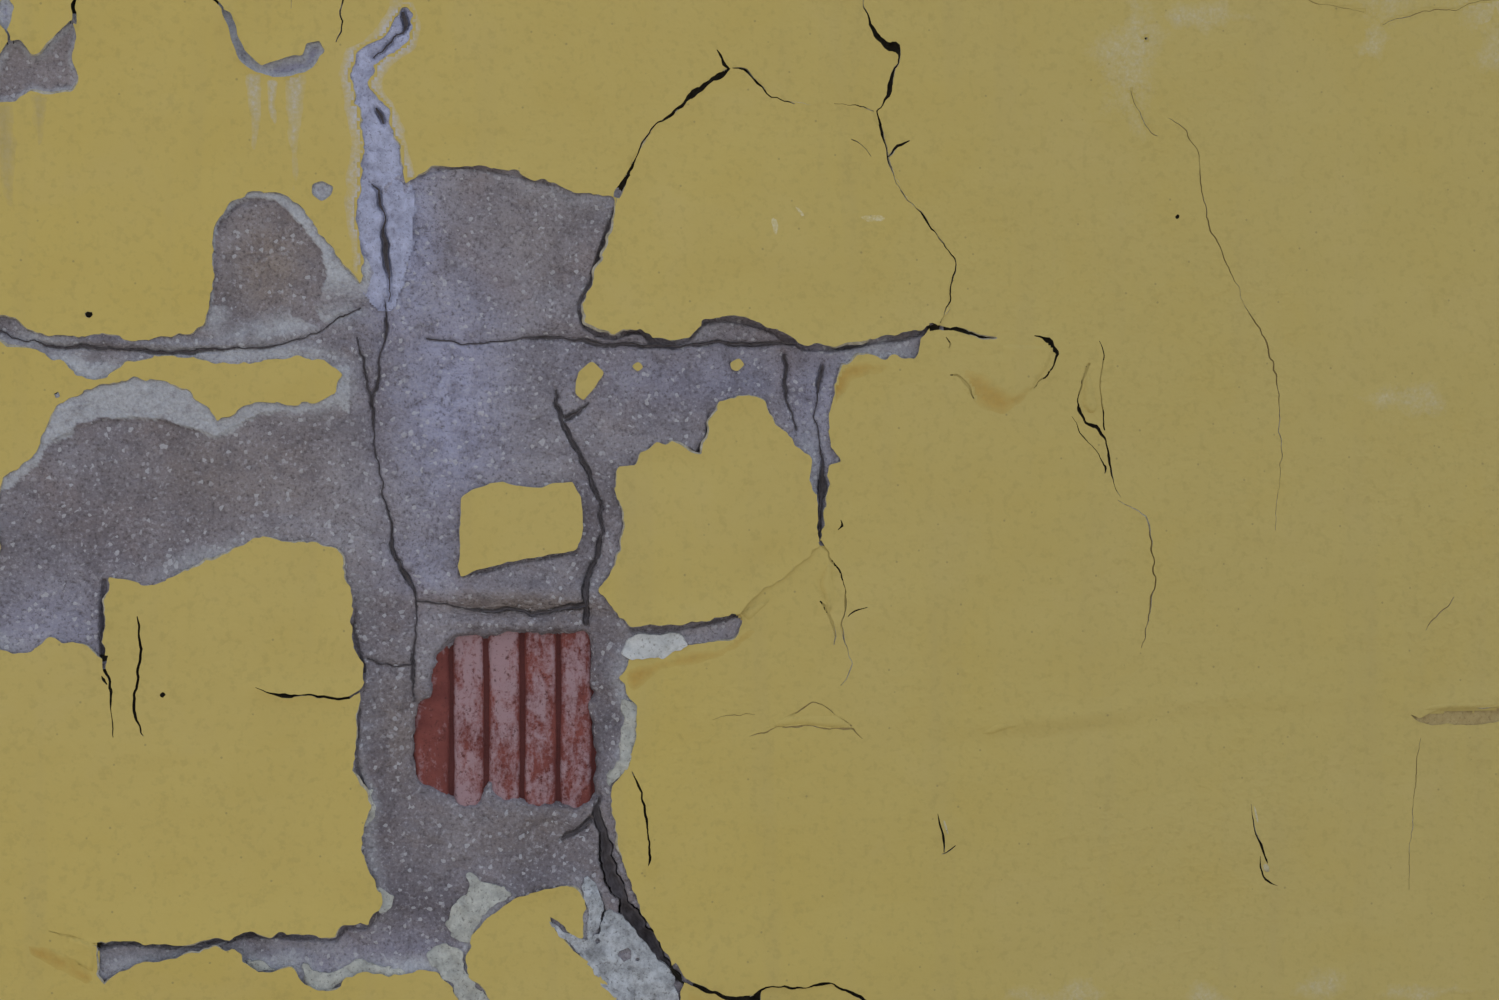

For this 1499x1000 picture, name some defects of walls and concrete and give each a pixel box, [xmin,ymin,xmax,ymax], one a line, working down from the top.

spalling [0,0,78,102]
spalling [218,2,324,77]
crack [611,50,793,197]
crack [834,7,909,168]
crack [0,0,604,702]
spalling [0,68,956,1000]
crack [426,336,867,616]
crack [918,210,992,399]
crack [1034,335,1118,493]
crack [1131,93,1282,495]
crack [100,616,143,736]
crack [561,776,866,1000]